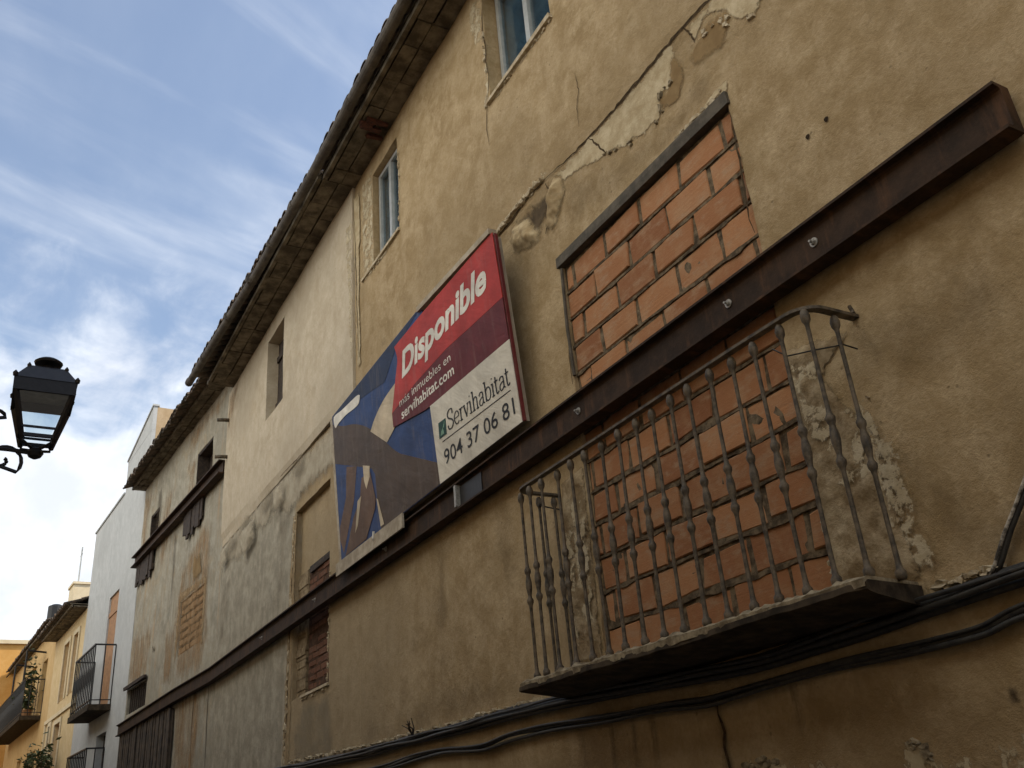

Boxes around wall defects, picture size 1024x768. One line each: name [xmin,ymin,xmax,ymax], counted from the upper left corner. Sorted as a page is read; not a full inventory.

flaking render [469,1,552,109]
flaking render [496,46,674,237]
crack [498,0,710,236]
spalling [674,81,727,140]
flaking render [786,333,934,581]
crack [717,706,731,768]